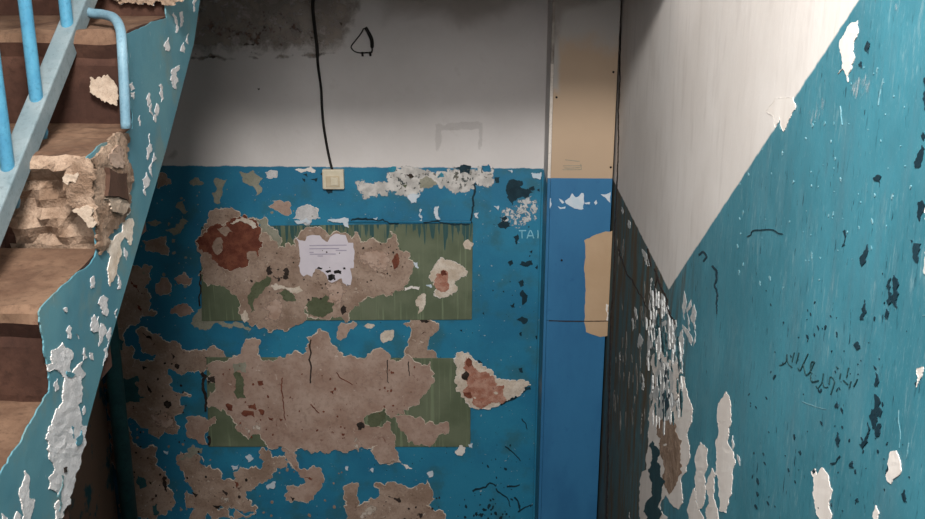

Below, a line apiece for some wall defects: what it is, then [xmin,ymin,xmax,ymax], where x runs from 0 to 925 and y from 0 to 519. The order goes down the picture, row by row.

flaking render [115,0,197,53]
water stain [194,0,357,60]
flaking render [89,74,119,106]
peeling [138,65,180,125]
peeling [904,133,925,168]
peeling [355,164,542,221]
peeling [550,192,611,210]
peeling [584,231,612,337]
peeling [911,240,925,274]
peeling [45,132,468,519]
flaking render [453,351,531,411]
peeling [639,351,736,519]